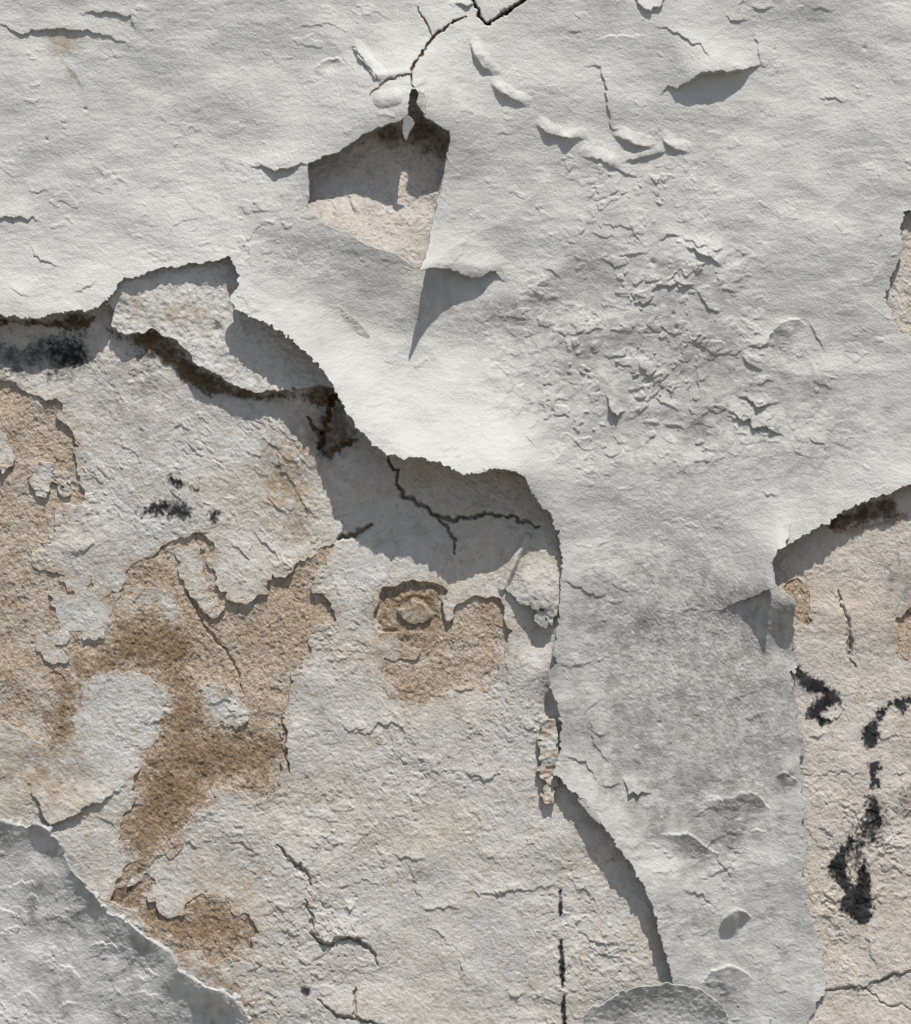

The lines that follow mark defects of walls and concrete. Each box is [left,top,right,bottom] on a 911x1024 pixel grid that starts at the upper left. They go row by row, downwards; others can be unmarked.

crack [353,0,526,96]
peeling [230,68,538,293]
peeling [874,191,911,356]
damp [0,313,95,379]
crack [338,524,373,540]
crack [388,458,541,554]
peeling [0,199,763,1024]
peeling [681,450,911,1024]
damp [849,795,887,871]
crack [276,845,379,967]